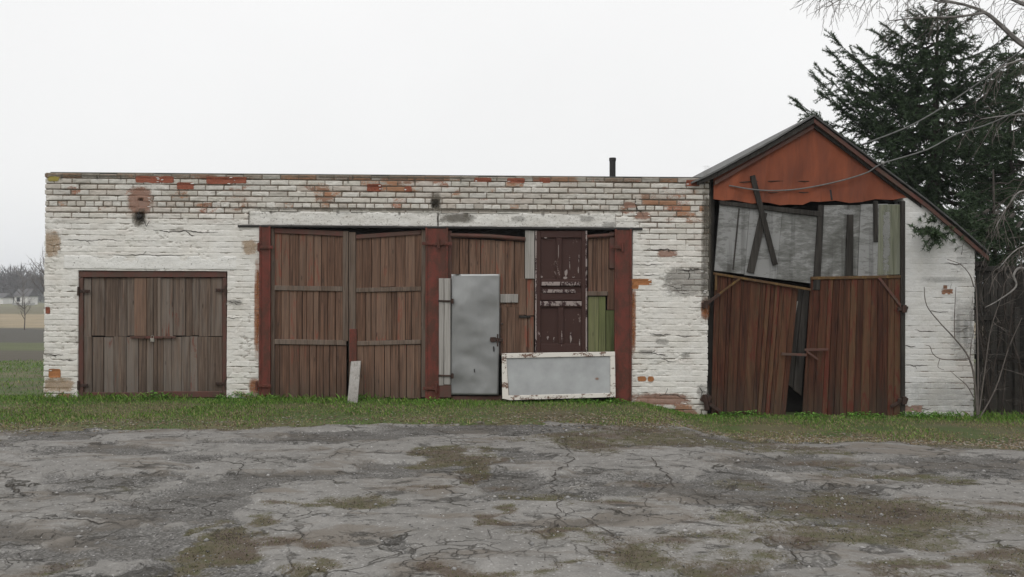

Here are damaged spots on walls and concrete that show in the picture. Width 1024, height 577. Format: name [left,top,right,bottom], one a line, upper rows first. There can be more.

peeling [128,176,247,213]
peeling [623,202,651,219]
peeling [45,231,61,257]
spalling [631,376,690,405]
crack [518,431,628,567]
crack [609,451,881,517]